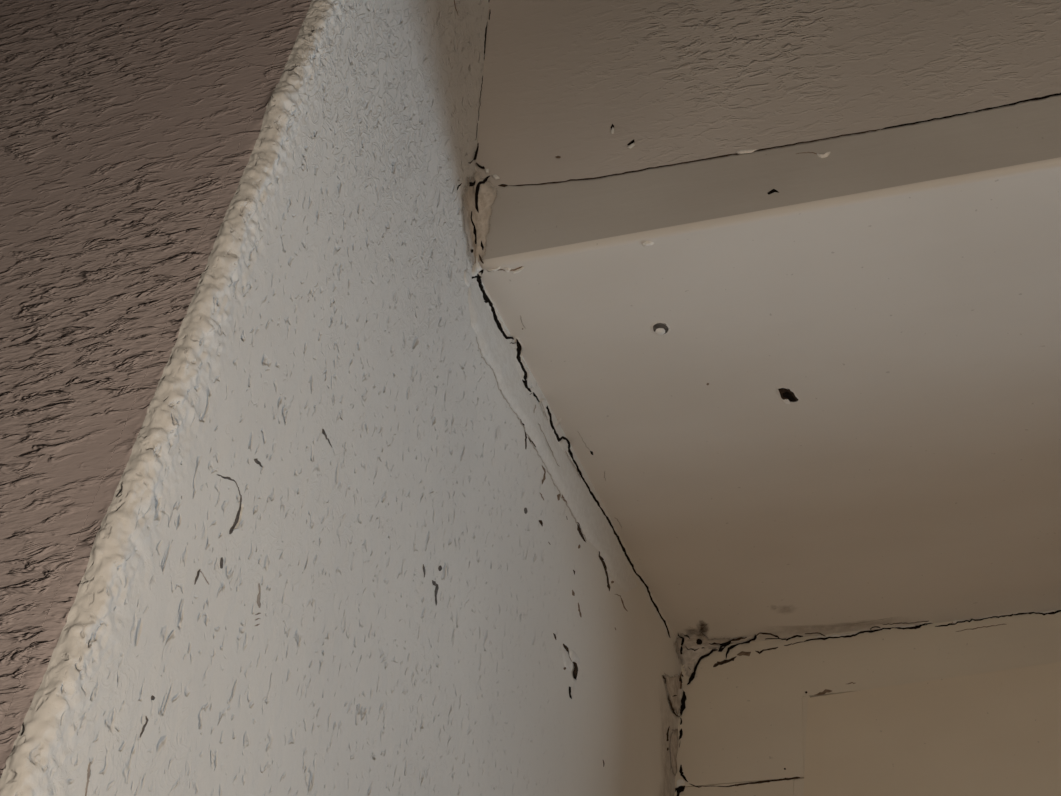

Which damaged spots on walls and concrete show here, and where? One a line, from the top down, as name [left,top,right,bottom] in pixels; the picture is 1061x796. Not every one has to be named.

crack [478,0,491,121]
crack [508,93,1061,186]
flaking render [457,123,524,287]
crack [472,270,670,638]
crack [756,608,1061,646]
crack [666,718,800,796]